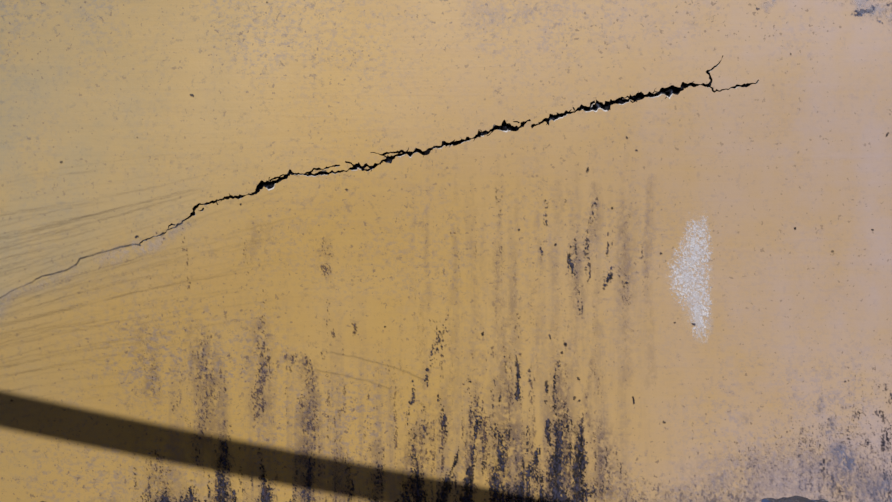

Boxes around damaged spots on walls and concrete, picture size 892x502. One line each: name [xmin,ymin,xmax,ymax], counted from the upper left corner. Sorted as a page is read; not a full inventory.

peeling [855,0,883,24]
crack [36,56,759,279]
leakage [567,231,591,282]
leakage [140,350,273,502]
leakage [254,327,270,417]
leakage [289,398,344,502]
leakage [394,346,609,502]